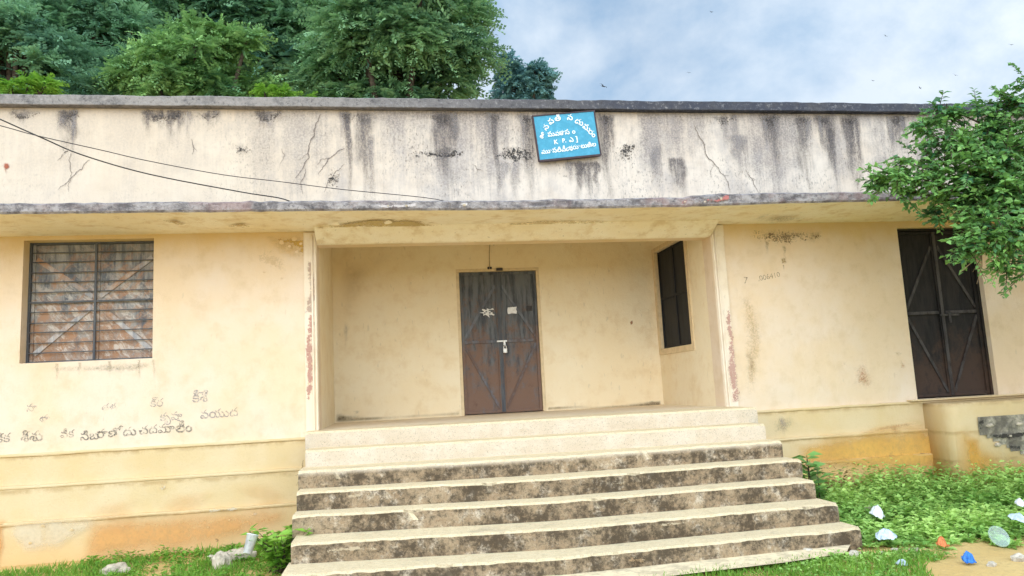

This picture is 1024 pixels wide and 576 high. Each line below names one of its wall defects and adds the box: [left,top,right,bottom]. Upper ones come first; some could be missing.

damp [60,110,79,135]
damp [143,110,191,125]
crack [281,114,345,193]
damp [340,112,373,165]
damp [413,113,461,160]
damp [487,115,533,177]
damp [567,115,635,184]
damp [652,147,685,178]
crack [694,125,759,193]
damp [762,116,777,156]
damp [796,116,861,168]
spalling [978,414,1024,454]